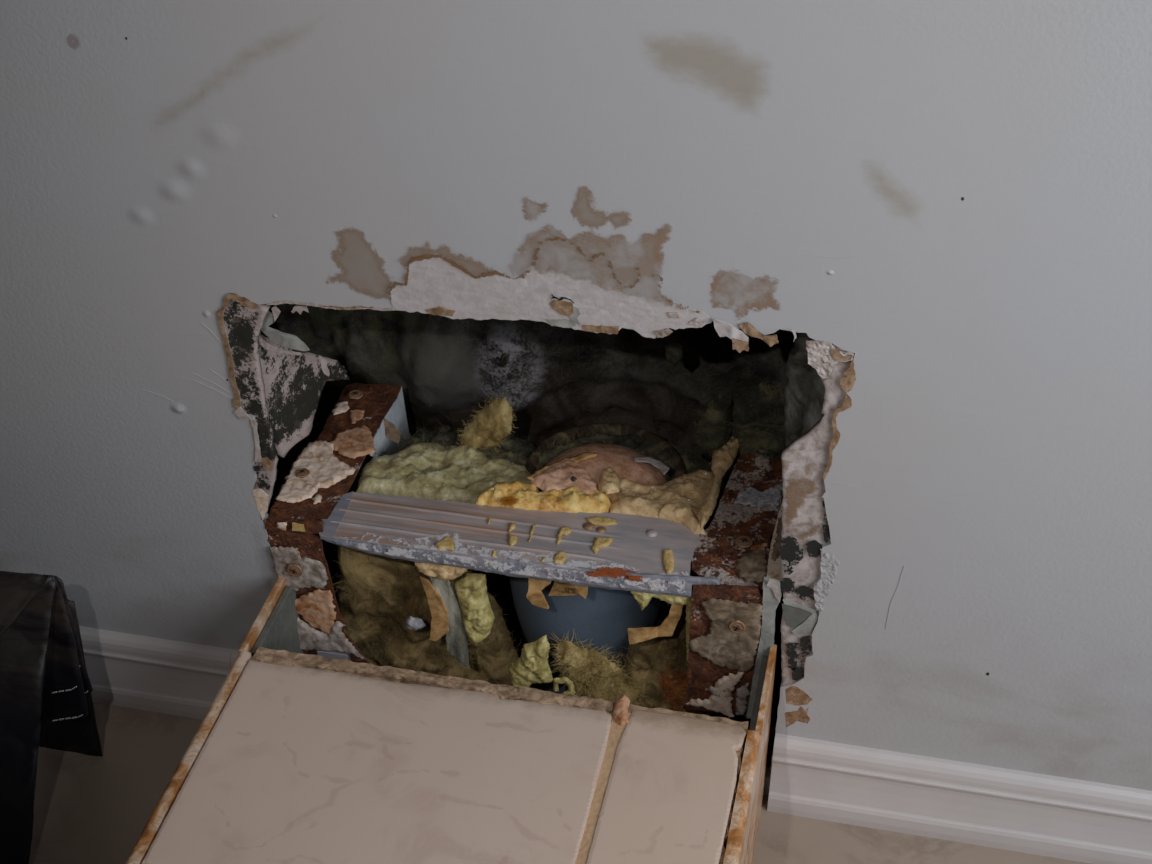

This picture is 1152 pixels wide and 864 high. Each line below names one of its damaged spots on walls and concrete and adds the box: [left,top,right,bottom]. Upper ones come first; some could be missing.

peeling [240,297,330,377]
peeling [391,257,779,353]
peeling [806,340,854,379]
spalling [267,450,294,515]
rust [735,483,783,511]
spalling [313,534,337,596]
damp [780,501,830,602]
spalling [468,569,528,658]
spalling [653,600,686,627]
spalling [766,591,812,767]
damp [785,636,812,681]
spalling [700,711,751,743]